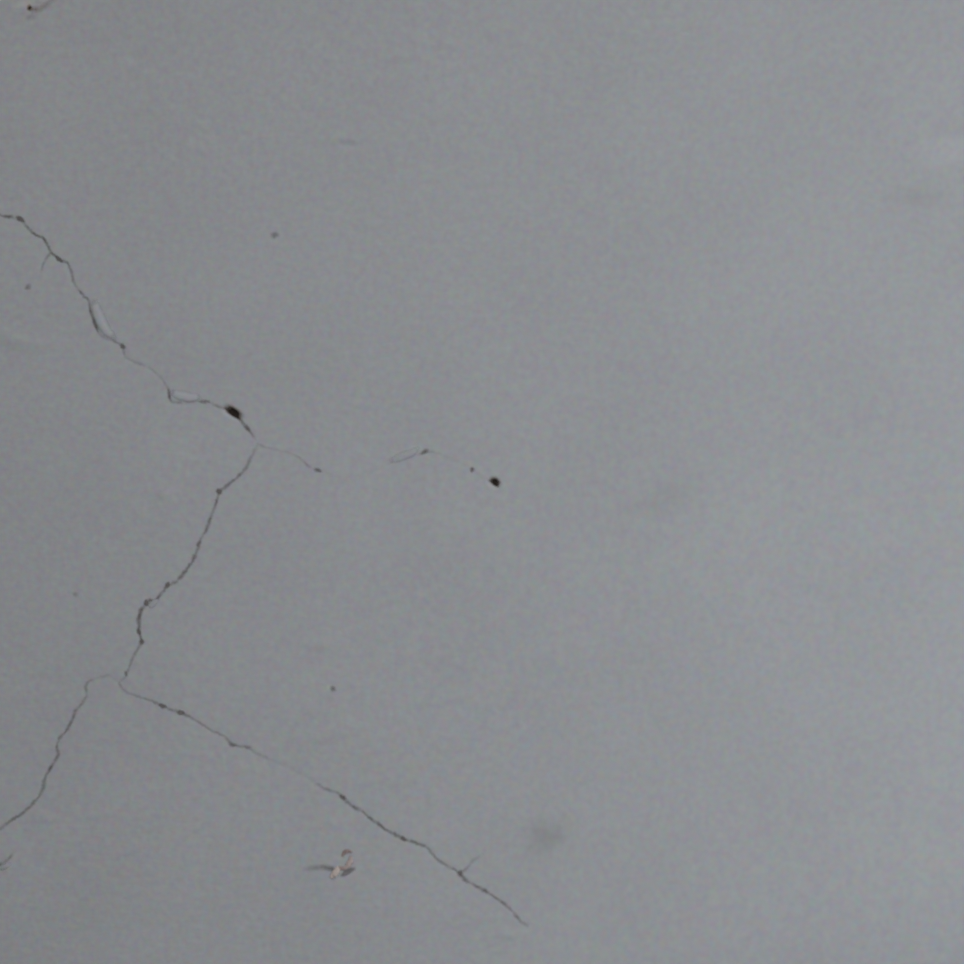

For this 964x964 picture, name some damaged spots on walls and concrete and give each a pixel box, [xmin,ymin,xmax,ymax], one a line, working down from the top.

crack [5,216,62,262]
crack [226,406,249,431]
crack [471,468,499,486]
crack [137,489,221,644]
crack [341,795,425,846]